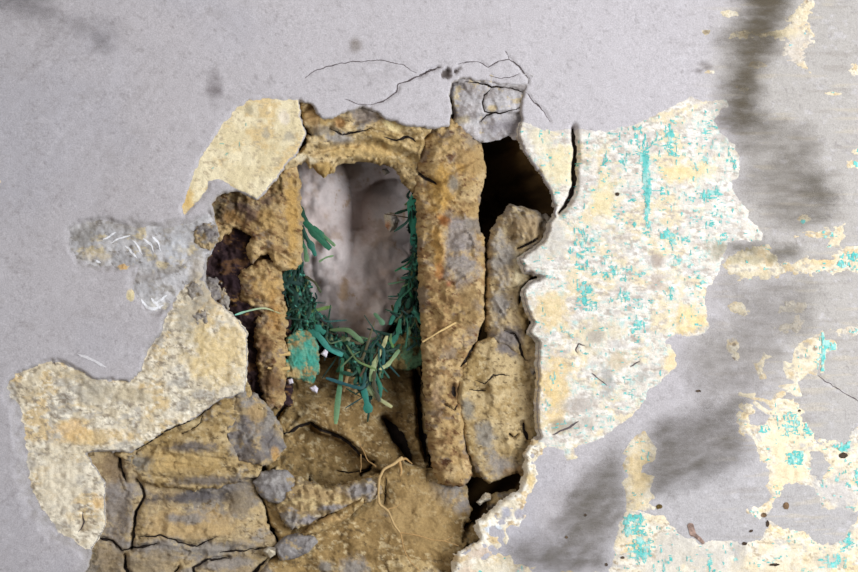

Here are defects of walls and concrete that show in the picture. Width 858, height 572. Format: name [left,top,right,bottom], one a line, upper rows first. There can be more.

crack [308,51,550,121]
damp [728,0,786,126]
peeling [764,0,815,74]
crack [299,115,311,151]
crack [331,128,416,142]
crack [559,129,577,213]
peeling [7,98,306,549]
peeling [450,73,858,572]
crack [79,404,278,572]
crack [276,406,387,504]
damp [545,473,614,560]